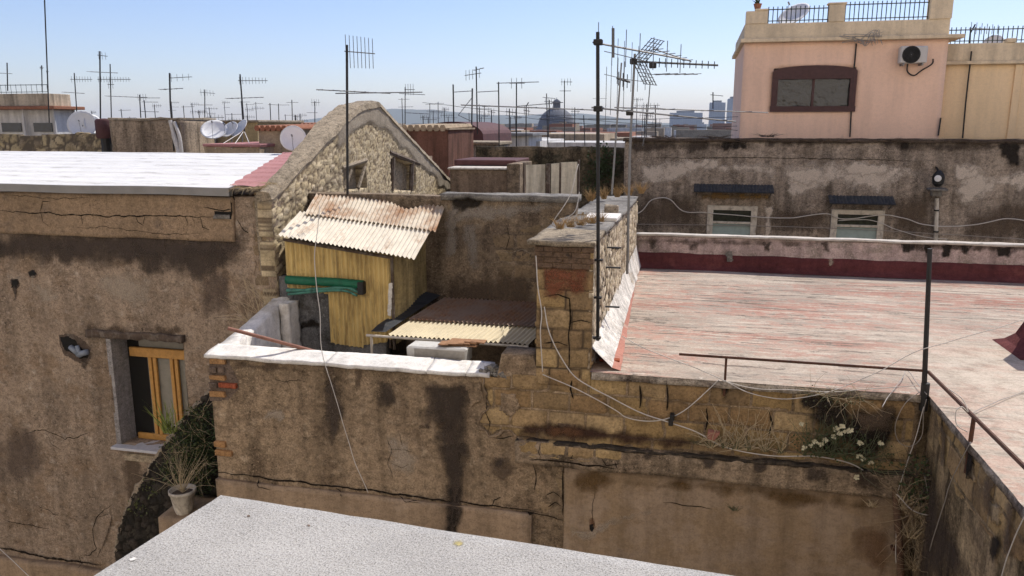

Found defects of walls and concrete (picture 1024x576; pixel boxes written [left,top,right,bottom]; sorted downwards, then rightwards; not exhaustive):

damp [631,138,749,152]
damp [884,140,1020,165]
crack [0,195,209,235]
damp [671,193,833,265]
damp [896,201,1024,257]
damp [0,234,241,307]
hole [59,333,91,369]
crack [545,294,591,398]
crack [218,434,536,512]
damp [424,385,469,532]
damp [515,396,912,490]
crack [1,505,112,568]